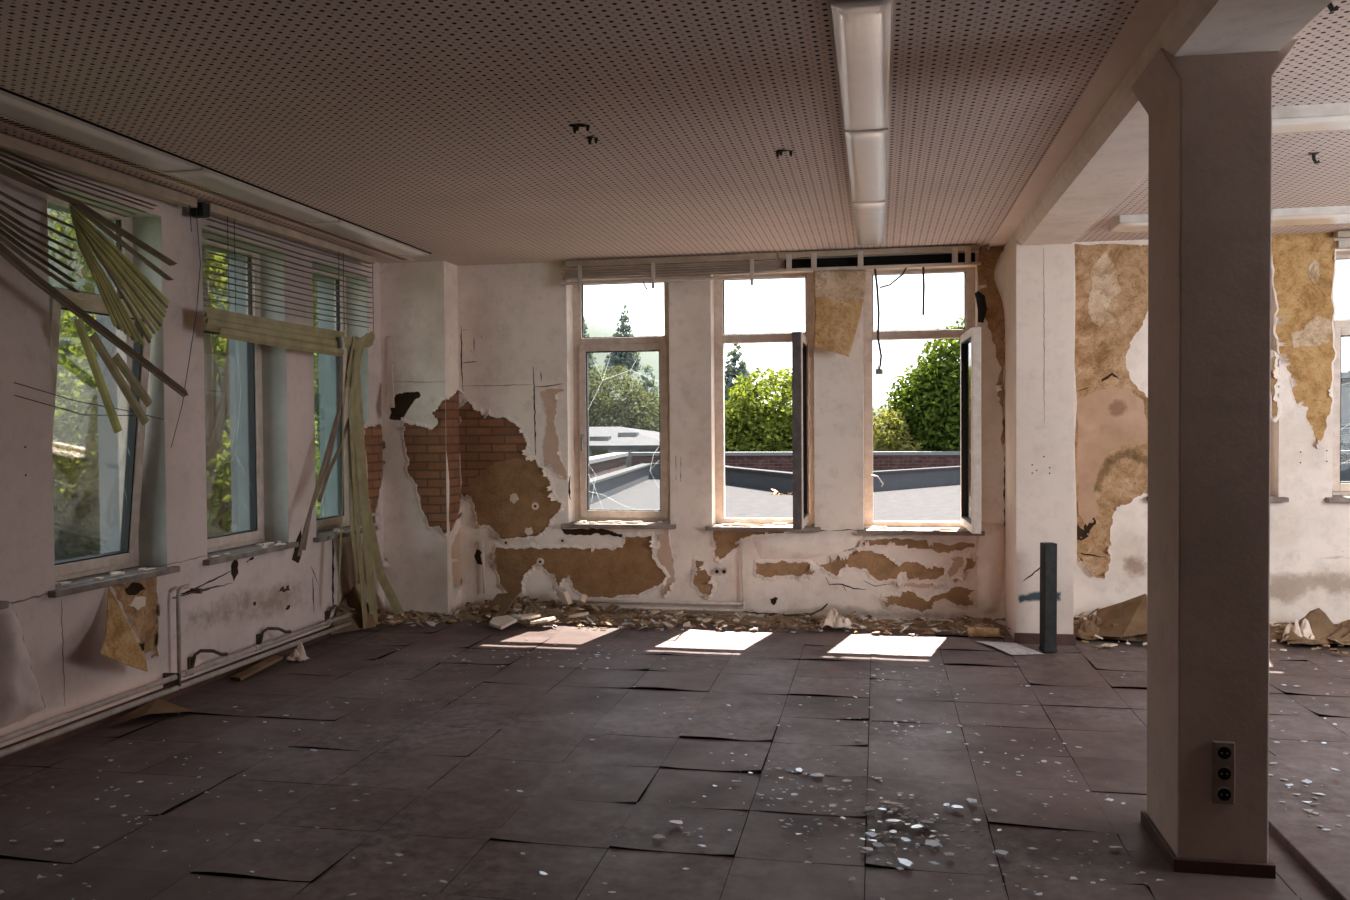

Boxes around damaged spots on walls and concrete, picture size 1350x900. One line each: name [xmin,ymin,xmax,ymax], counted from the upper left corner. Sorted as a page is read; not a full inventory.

peeling [813,269,866,357]
peeling [1271,315,1332,423]
spalling [364,386,1011,638]
spalling [1077,518,1096,541]
peeling [100,577,160,672]
spalling [1073,608,1147,648]
spalling [1269,617,1350,655]